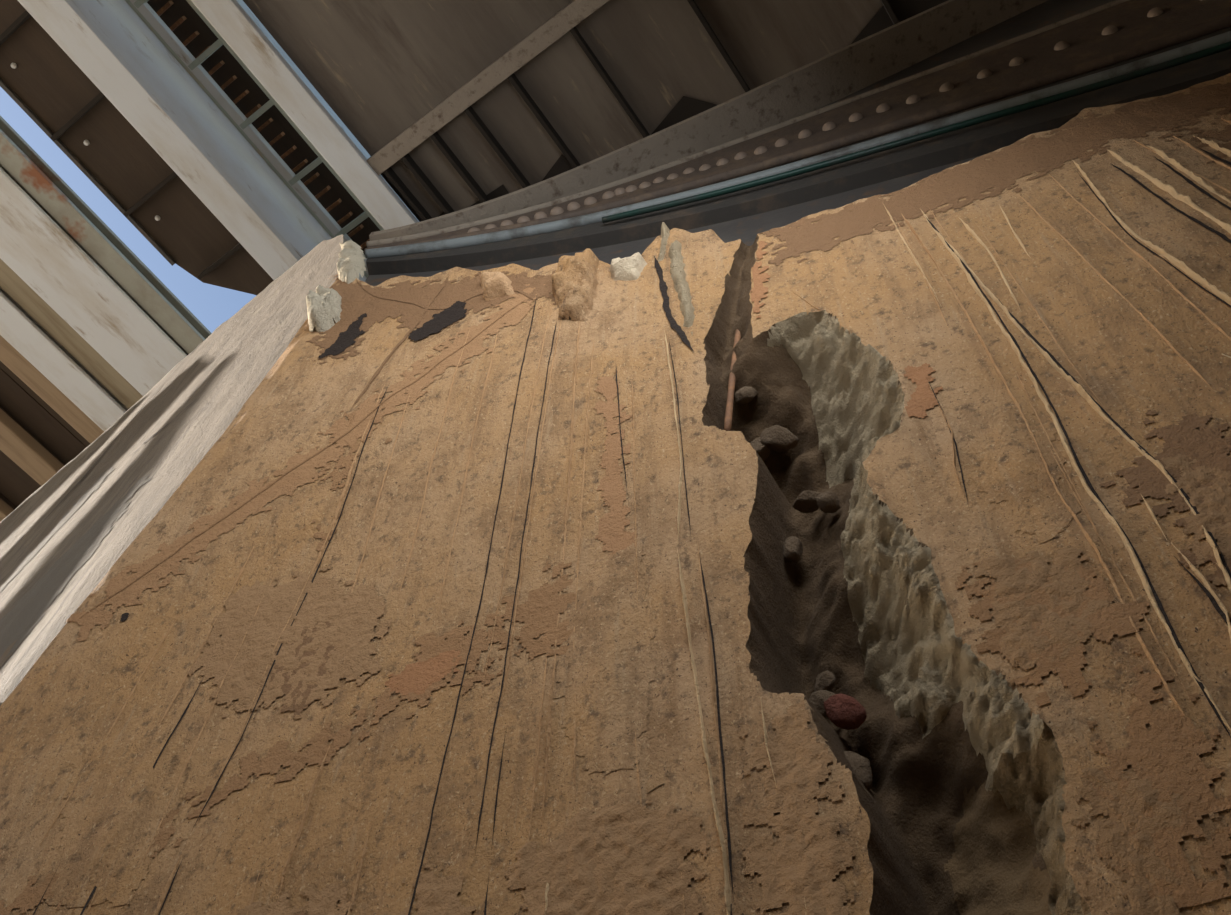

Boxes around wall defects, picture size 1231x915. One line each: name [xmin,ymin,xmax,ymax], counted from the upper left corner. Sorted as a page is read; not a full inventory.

crack [1077,172,1231,307]
crack [1110,156,1231,243]
crack [1196,146,1231,165]
crack [925,216,1231,738]
crack [654,235,988,915]
spalling [504,800,710,915]
spalling [739,699,856,915]